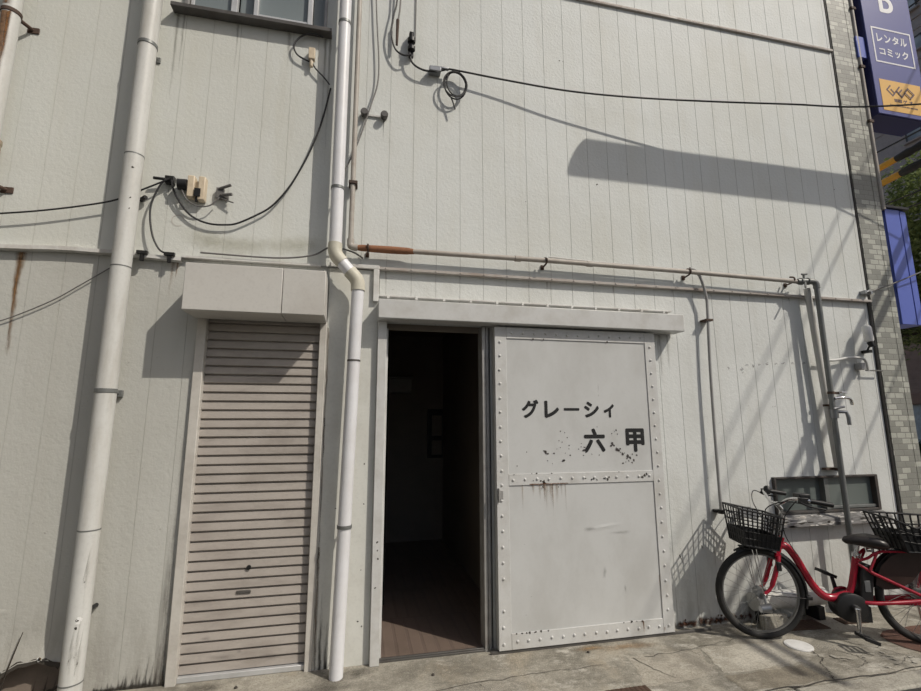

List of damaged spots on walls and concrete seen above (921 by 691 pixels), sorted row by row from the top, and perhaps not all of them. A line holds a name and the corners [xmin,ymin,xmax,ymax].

rust [0,0,11,54]
rust [12,252,23,311]